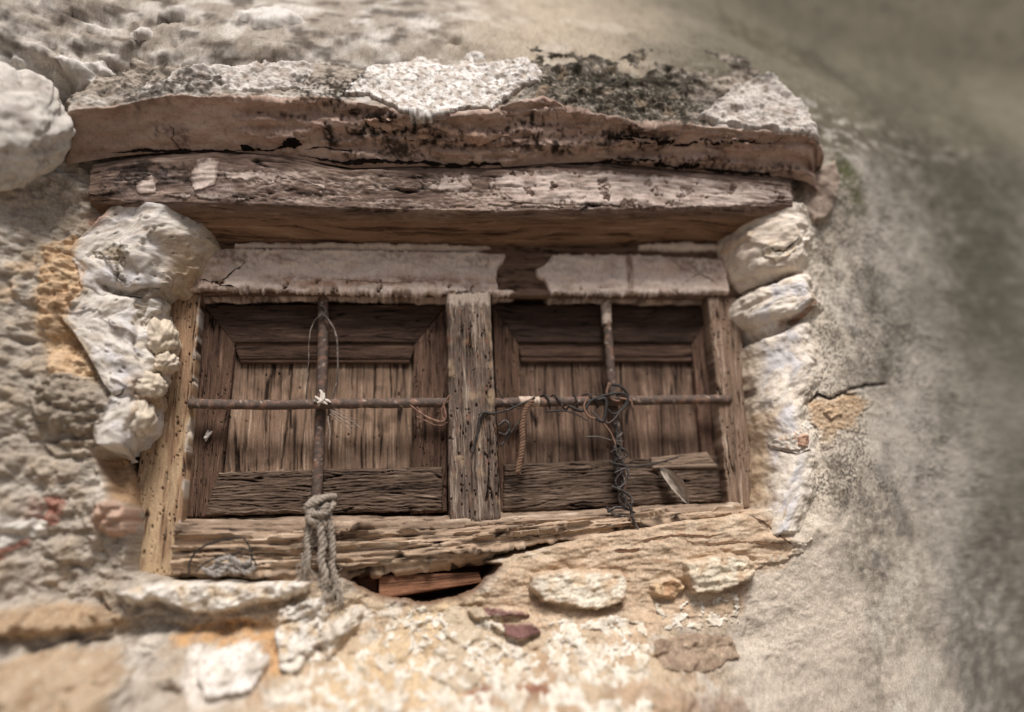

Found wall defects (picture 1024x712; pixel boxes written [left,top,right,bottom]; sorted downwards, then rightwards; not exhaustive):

crack [112,125,241,153]
spalling [30,234,140,462]
crack [809,383,885,402]
spalling [767,395,874,451]